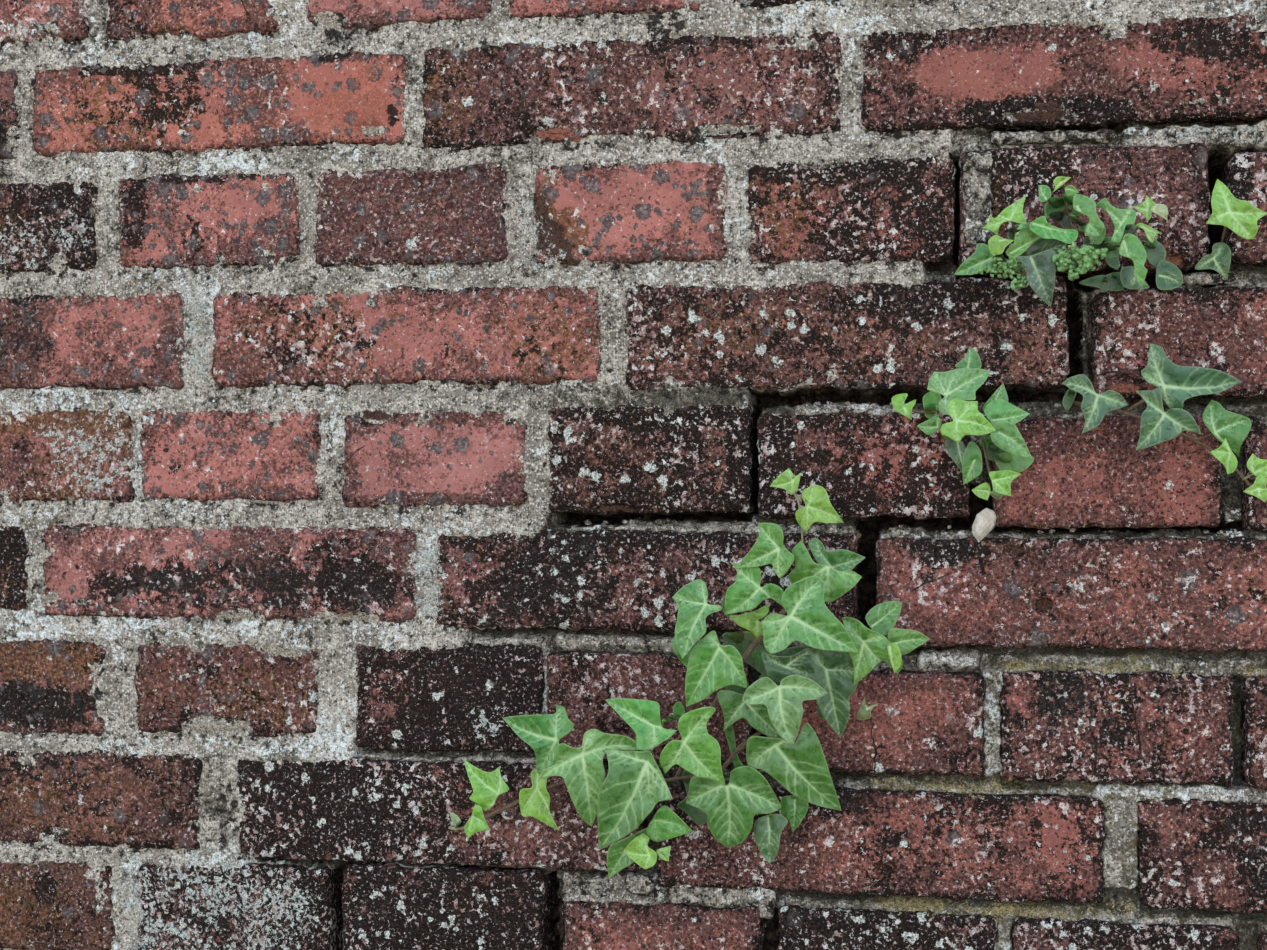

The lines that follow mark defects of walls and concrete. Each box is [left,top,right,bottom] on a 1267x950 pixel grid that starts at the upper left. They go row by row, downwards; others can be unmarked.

crack [995,126,1124,134]
crack [559,150,1252,529]
crack [855,485,1244,630]
crack [869,717,877,772]
crack [1081,706,1098,777]
crack [1129,676,1141,754]
crack [549,874,565,950]
crack [762,910,780,950]